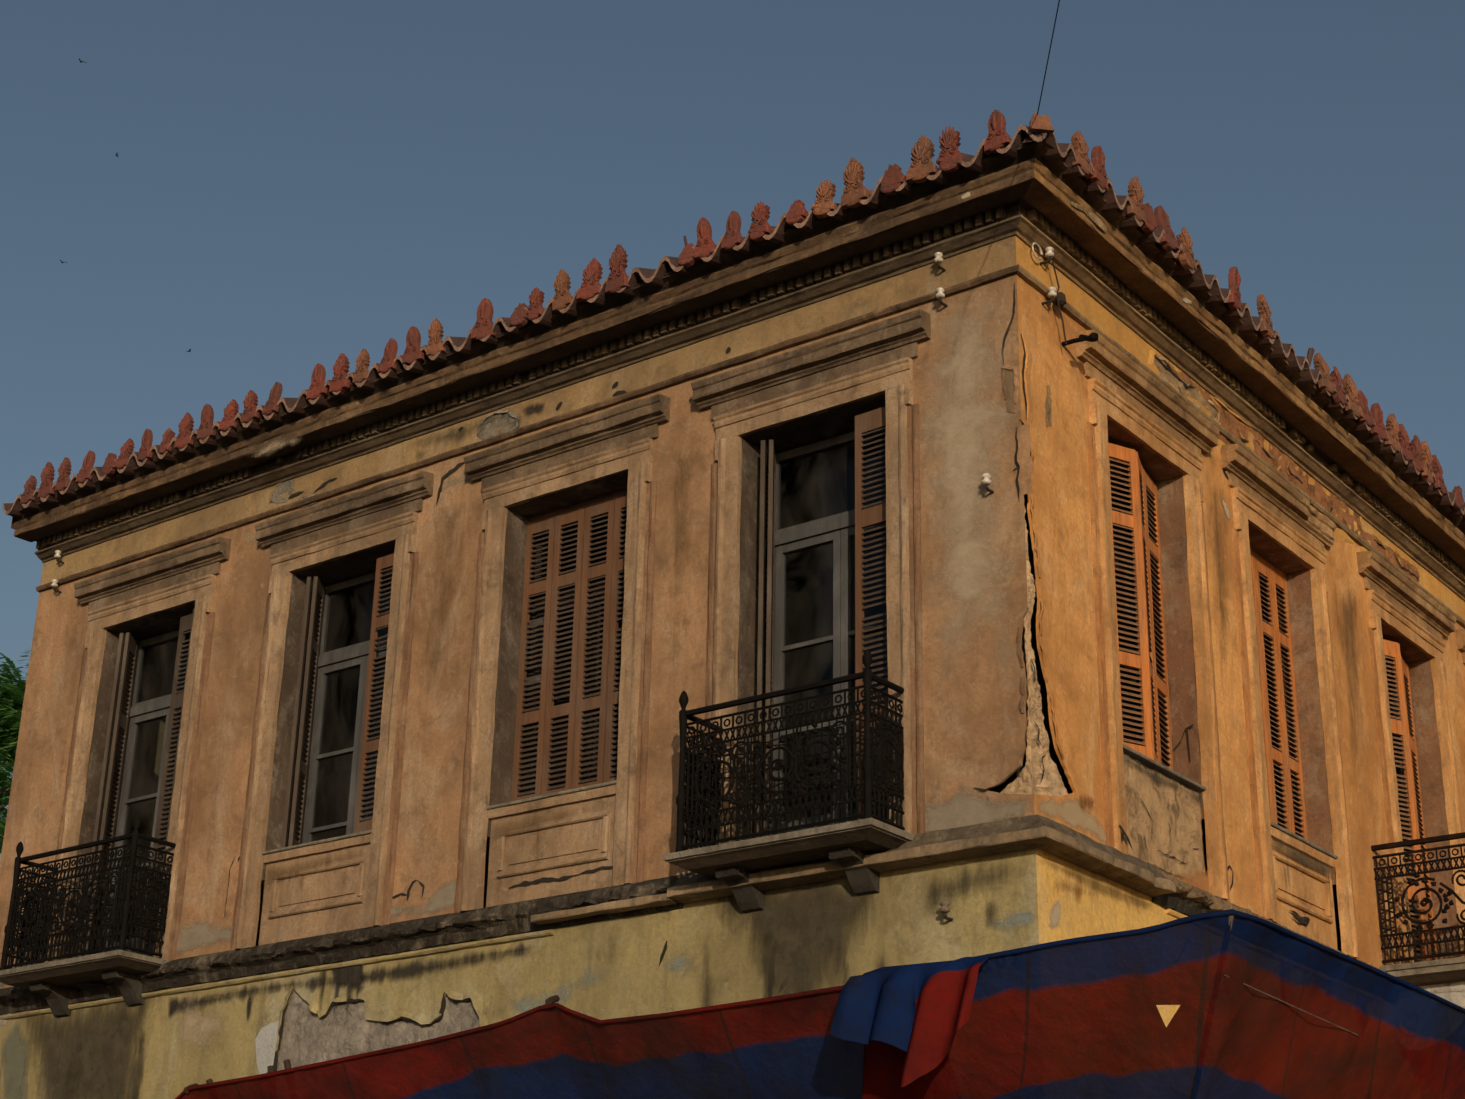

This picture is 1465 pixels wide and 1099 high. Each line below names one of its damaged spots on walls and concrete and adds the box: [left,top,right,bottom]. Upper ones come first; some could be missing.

spalling [988,494,1068,797]
spalling [1124,757,1205,880]
damp [3,999,147,1099]
damp [169,946,524,1019]
peeling [255,986,488,1074]